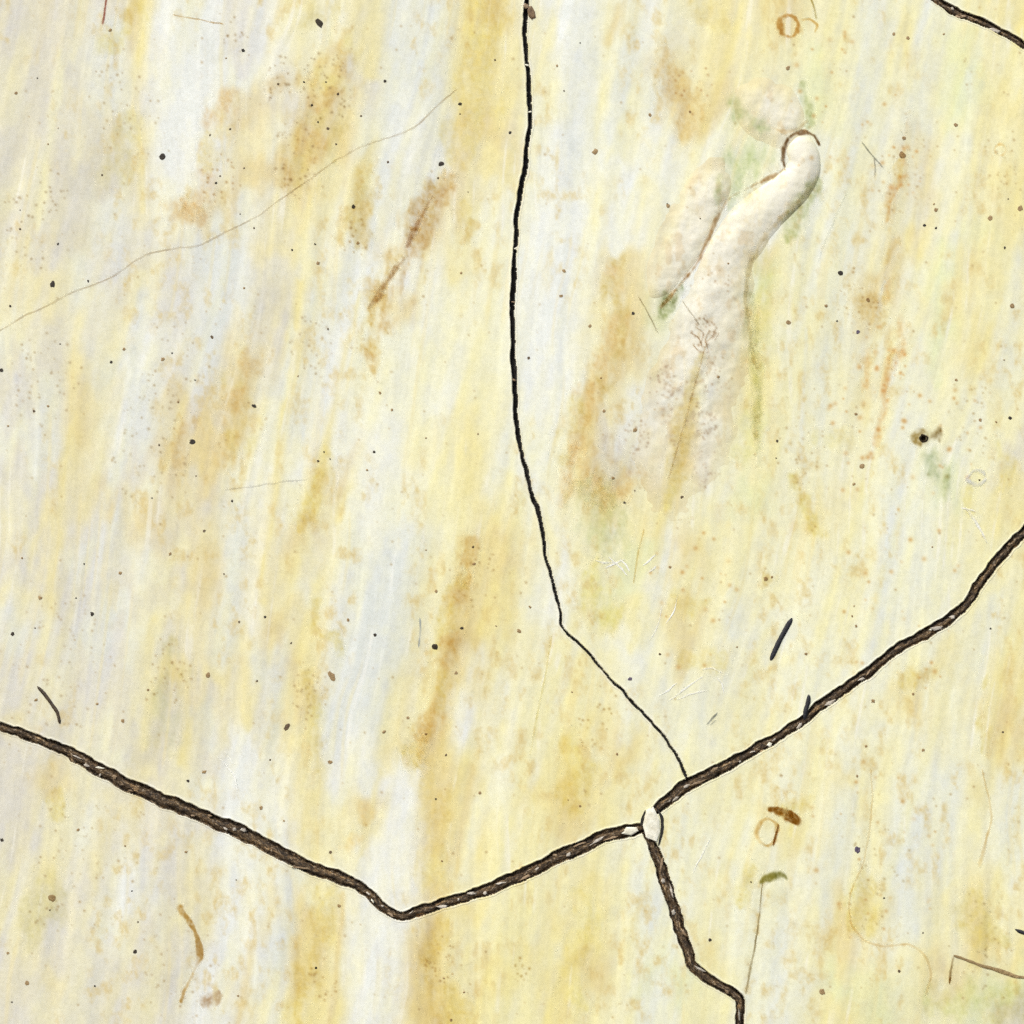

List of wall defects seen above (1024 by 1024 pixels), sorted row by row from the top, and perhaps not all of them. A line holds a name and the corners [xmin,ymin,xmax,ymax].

crack [508,0,1024,846]
crack [0,720,747,1024]
rust [768,807,800,845]
crack [949,955,1024,984]